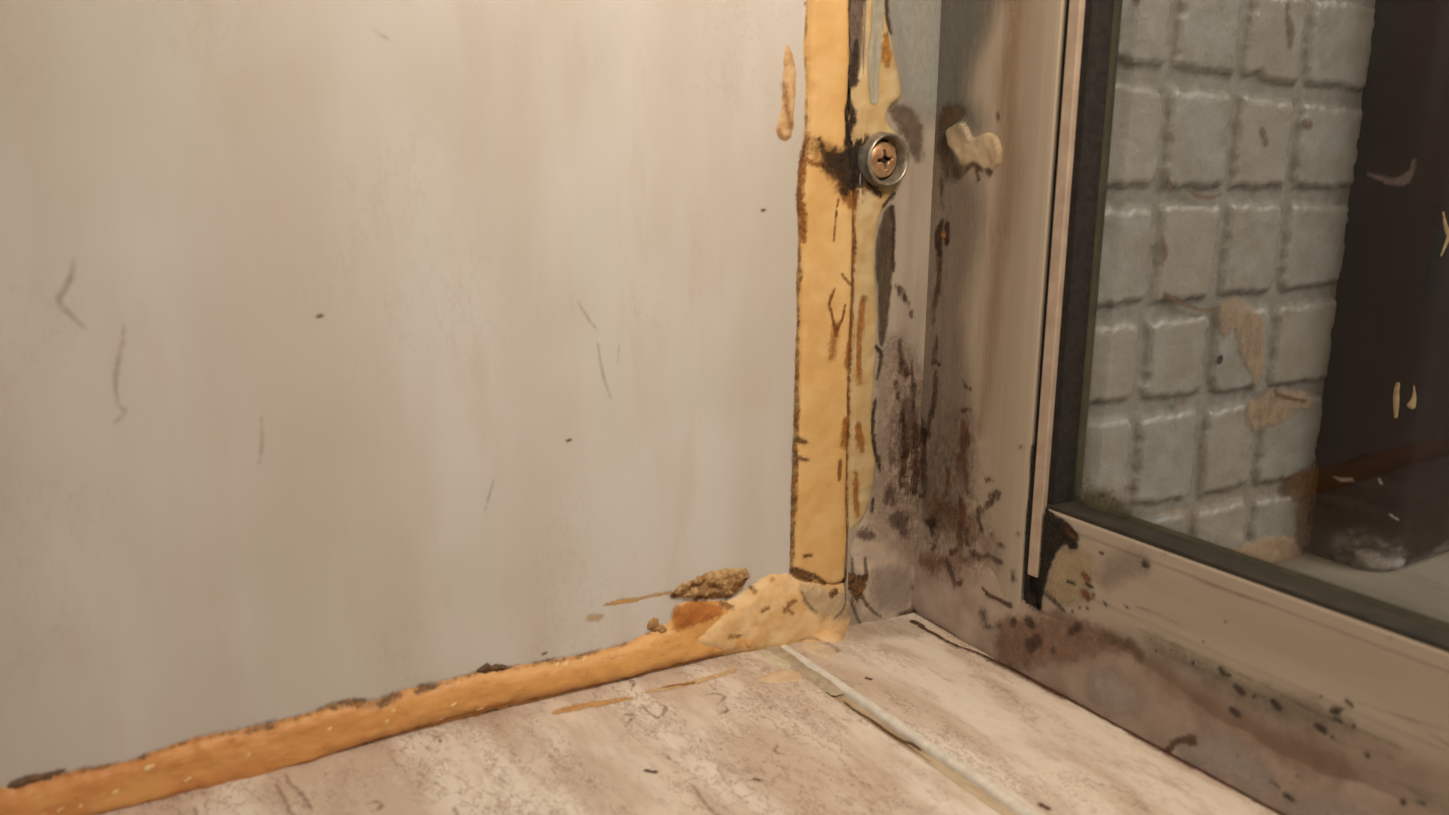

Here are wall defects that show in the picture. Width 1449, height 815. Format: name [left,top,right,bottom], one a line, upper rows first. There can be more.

peeling [891,0,1003,181]
water stain [932,252,942,322]
peeling [1164,292,1311,430]
water stain [883,339,1002,556]
water stain [836,557,881,624]
water stain [857,528,876,540]
water stain [981,445,1157,666]
water stain [1218,667,1283,718]
water stain [1314,695,1355,738]